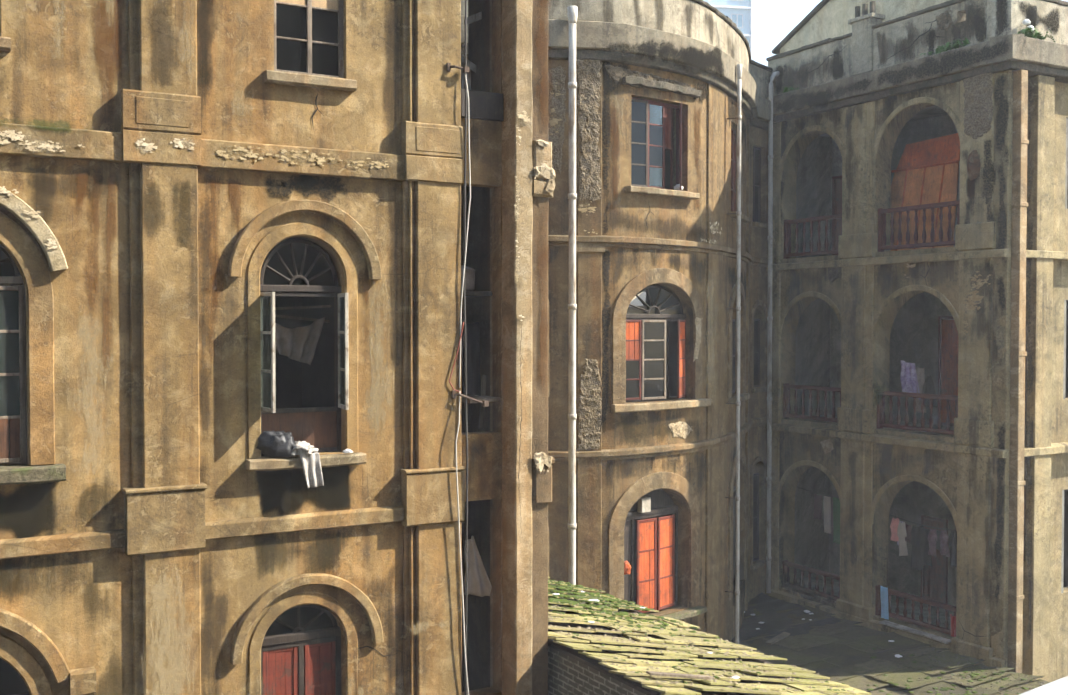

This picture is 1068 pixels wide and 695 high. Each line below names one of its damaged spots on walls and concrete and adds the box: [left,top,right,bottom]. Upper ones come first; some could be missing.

leakage [151,0,214,129]
peeling [0,129,66,152]
peeling [136,138,158,154]
peeling [216,145,390,169]
flaking render [534,59,692,215]
leakage [548,0,1068,259]
leakage [602,249,637,423]
leakage [1026,217,1034,394]
flaking render [576,358,602,452]
flaking render [669,422,692,439]
leakage [0,482,55,538]
leakage [1024,409,1033,638]